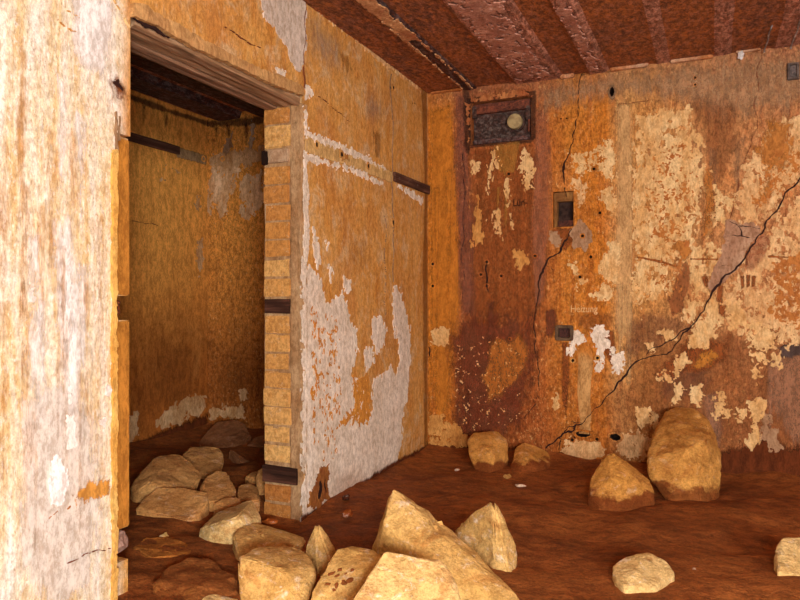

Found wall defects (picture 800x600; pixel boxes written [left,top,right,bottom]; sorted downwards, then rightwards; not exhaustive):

peeling [129,0,423,522]
peeling [469,146,514,248]
peeling [512,248,530,271]
peeling [517,147,536,191]
crack [524,229,572,418]
crack [545,51,800,449]
peeling [566,104,800,453]
peeling [428,326,520,448]
peeling [616,406,659,462]